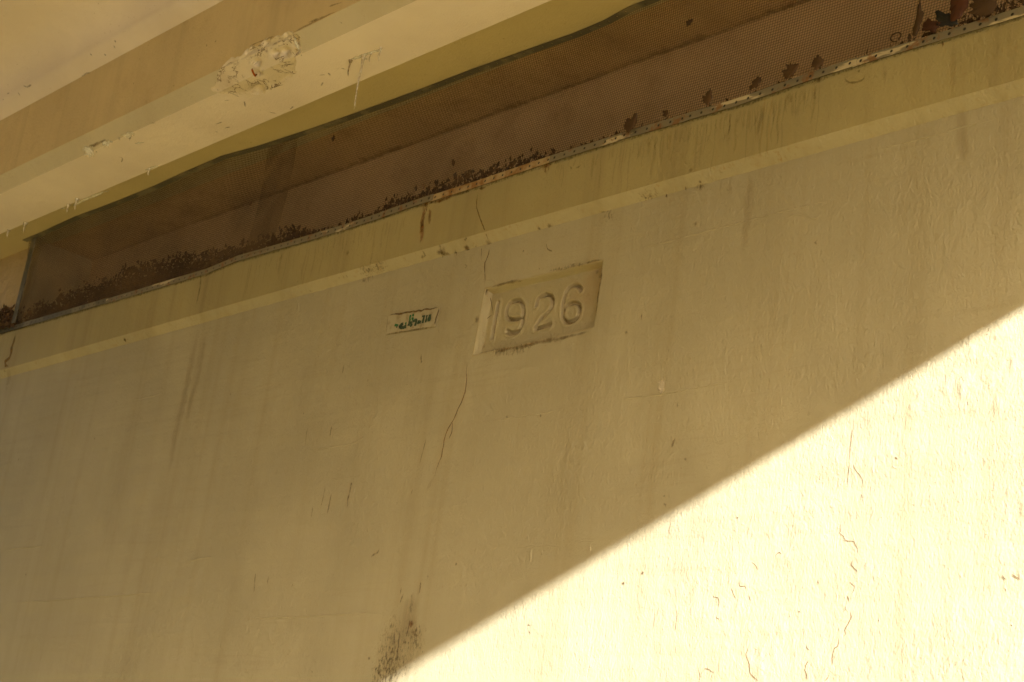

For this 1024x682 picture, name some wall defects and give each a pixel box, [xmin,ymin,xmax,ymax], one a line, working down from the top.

spalling [211,31,303,103]
crack [437,370,467,467]